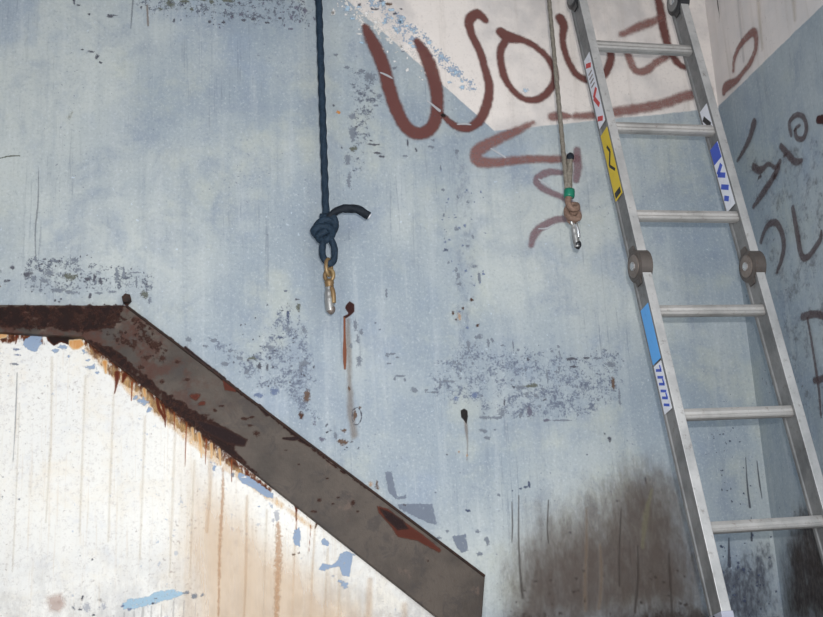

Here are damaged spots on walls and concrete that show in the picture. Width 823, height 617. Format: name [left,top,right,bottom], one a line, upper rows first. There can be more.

peeling [332,0,477,90]
peeling [333,66,385,190]
peeling [24,255,152,303]
corrosion [0,301,369,495]
peeling [375,471,437,524]
peeling [121,589,203,611]
peeling [319,551,355,589]
peeling [437,530,490,555]
water stain [523,489,709,617]
water stain [788,528,823,617]